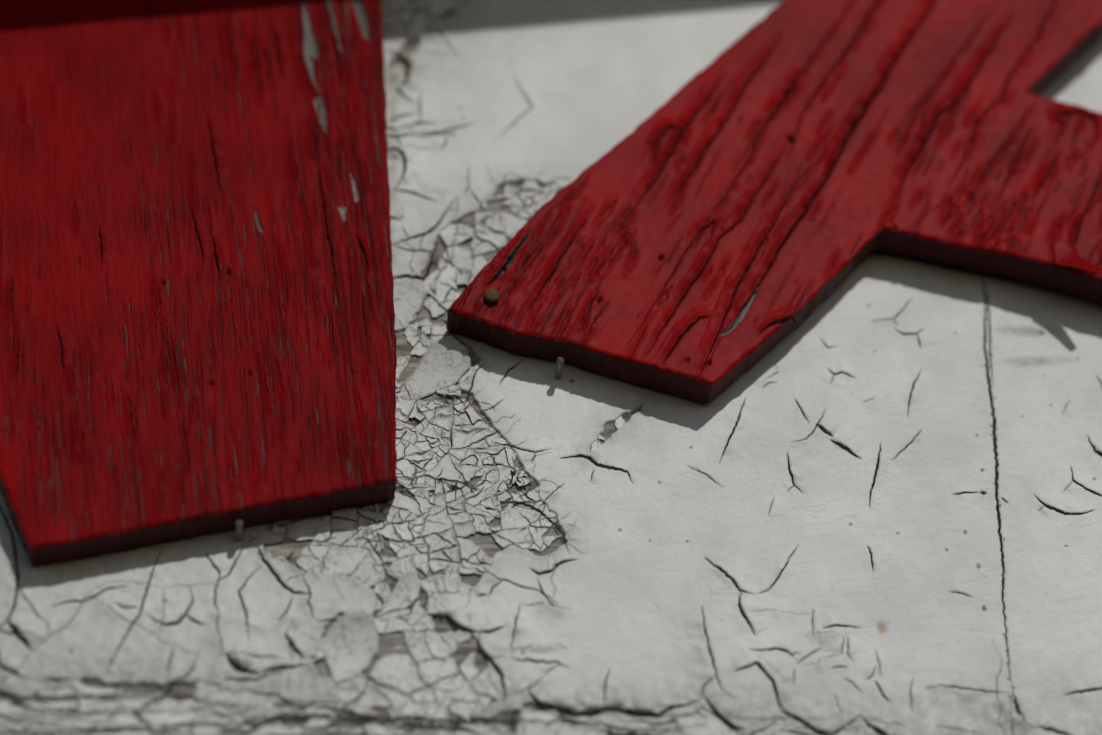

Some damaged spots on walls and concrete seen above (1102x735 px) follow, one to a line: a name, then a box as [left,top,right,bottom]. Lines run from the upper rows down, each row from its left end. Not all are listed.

crack [627,0,936,374]
peeling [0,166,882,735]
crack [0,271,1070,735]
crack [1036,468,1102,515]
crack [1087,436,1102,457]
crack [1062,687,1102,695]